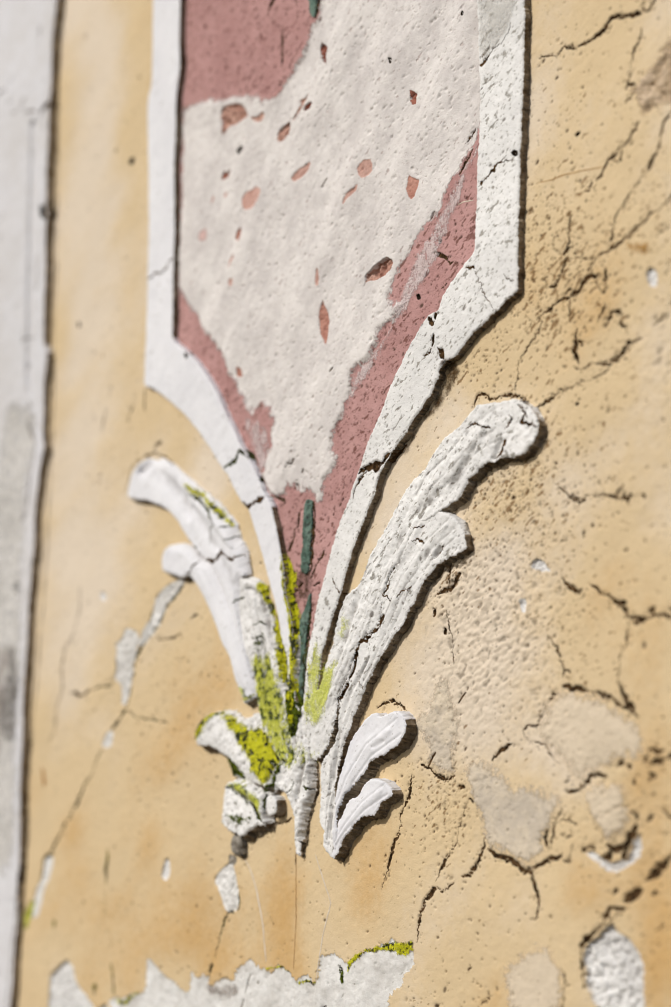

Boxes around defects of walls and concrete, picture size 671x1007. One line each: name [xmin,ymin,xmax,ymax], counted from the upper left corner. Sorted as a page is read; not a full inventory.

spalling [220,103,264,133]
crack [459,0,671,459]
spalling [365,257,393,282]
crack [434,252,493,308]
spalling [319,299,330,344]
crack [558,485,646,504]
crack [31,449,315,913]
crack [382,578,671,942]
peeling [215,854,239,912]
peeling [48,938,415,1007]
spalling [583,922,645,1007]
crack [563,855,671,1006]